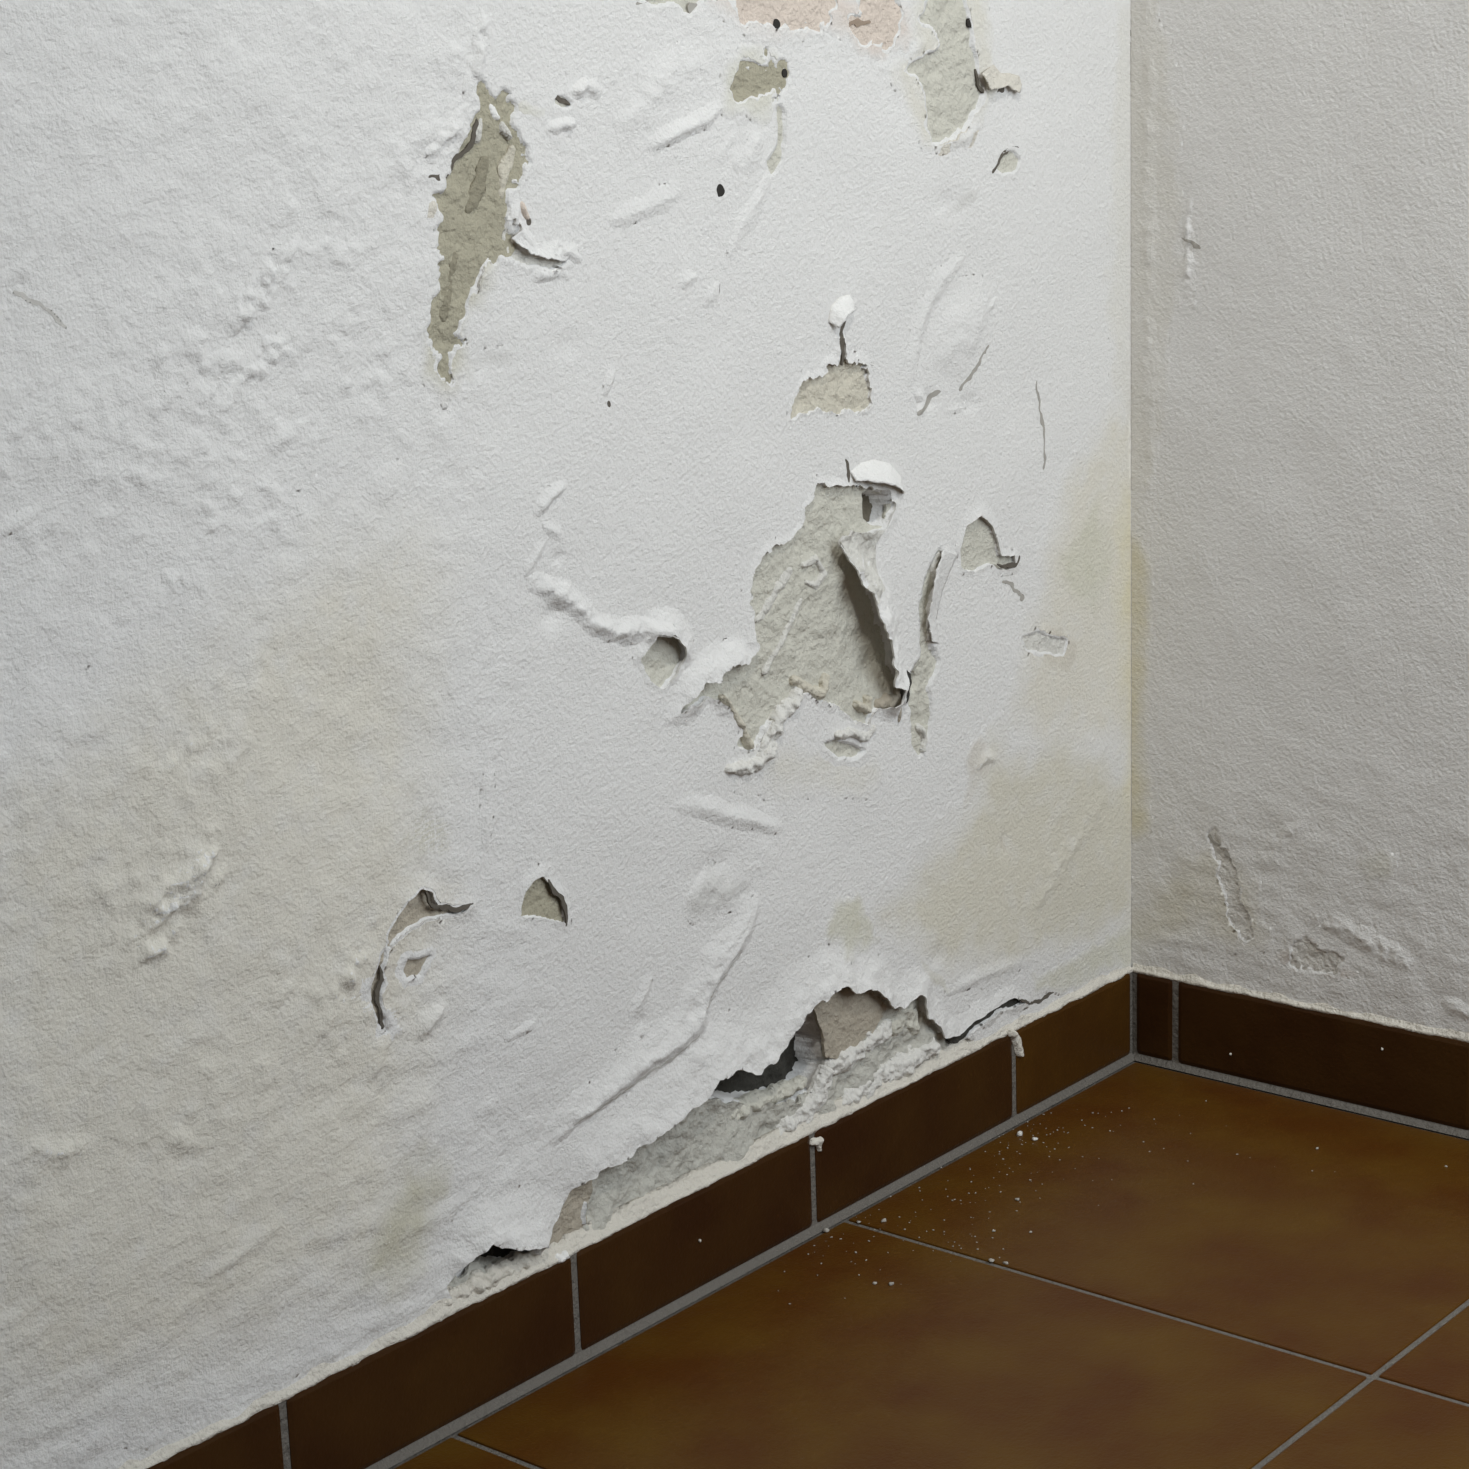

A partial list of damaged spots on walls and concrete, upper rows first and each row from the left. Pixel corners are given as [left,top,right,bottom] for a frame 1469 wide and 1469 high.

peeling [647,0,698,14]
peeling [736,0,902,50]
peeling [907,0,1022,142]
peeling [427,81,573,383]
peeling [785,295,875,430]
peeling [632,460,1020,757]
peeling [371,886,473,1024]
peeling [514,861,572,933]
peeling [434,945,1031,1300]